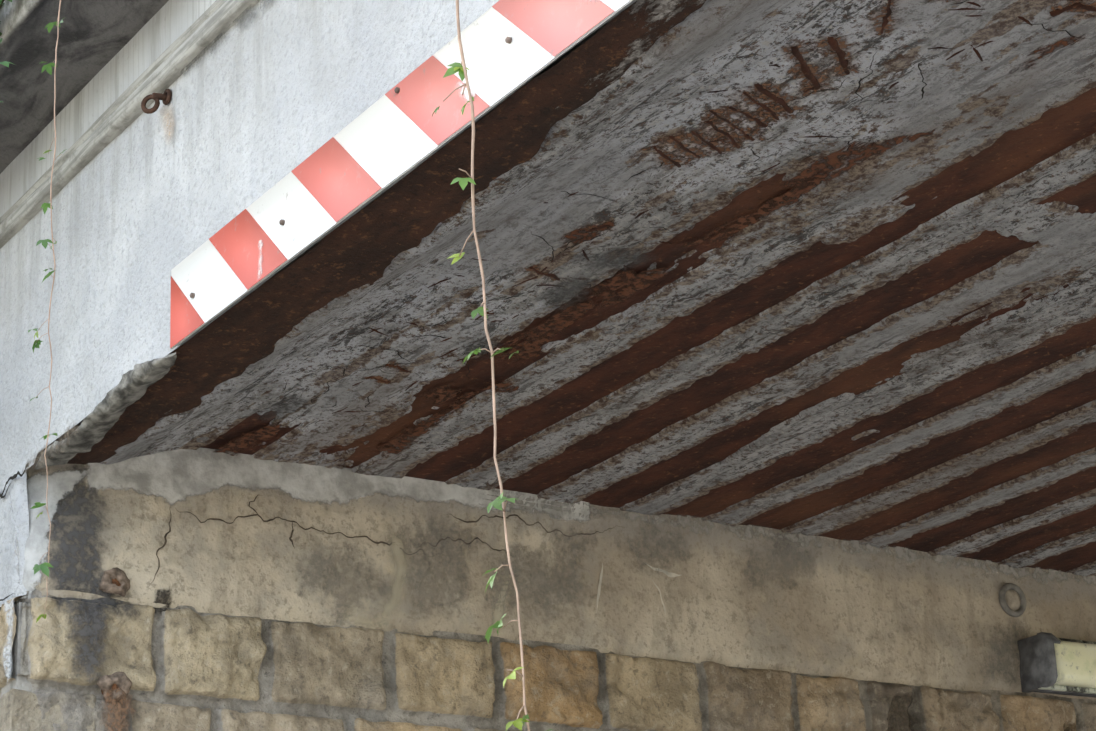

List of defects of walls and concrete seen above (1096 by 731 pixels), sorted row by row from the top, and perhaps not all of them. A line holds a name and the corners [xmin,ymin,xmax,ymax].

spalling [1009,34,1085,72]
spalling [1050,0,1096,17]
spalling [641,35,859,169]
spalling [659,129,935,248]
spalling [557,220,615,261]
spalling [499,260,670,361]
crack [0,425,79,499]
spalling [35,352,177,470]
spalling [377,380,519,455]
damp [46,467,133,681]
spalling [154,590,171,614]
crack [149,495,619,586]